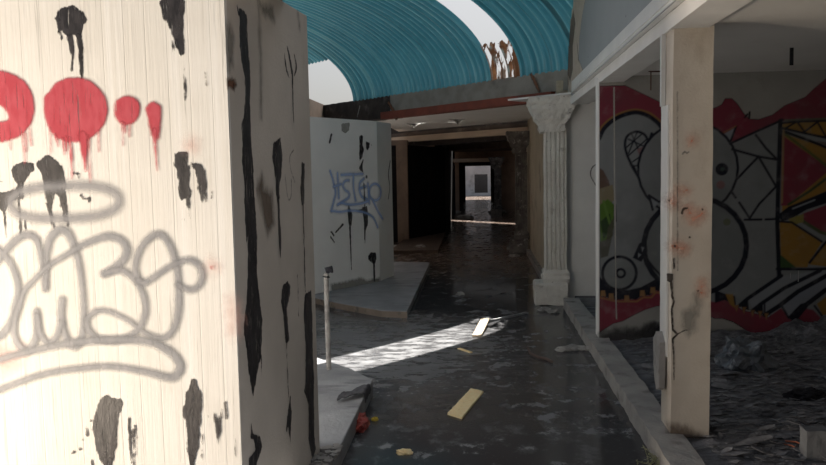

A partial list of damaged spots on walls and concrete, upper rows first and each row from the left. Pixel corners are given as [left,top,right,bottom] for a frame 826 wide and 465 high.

crack [667,258,688,378]